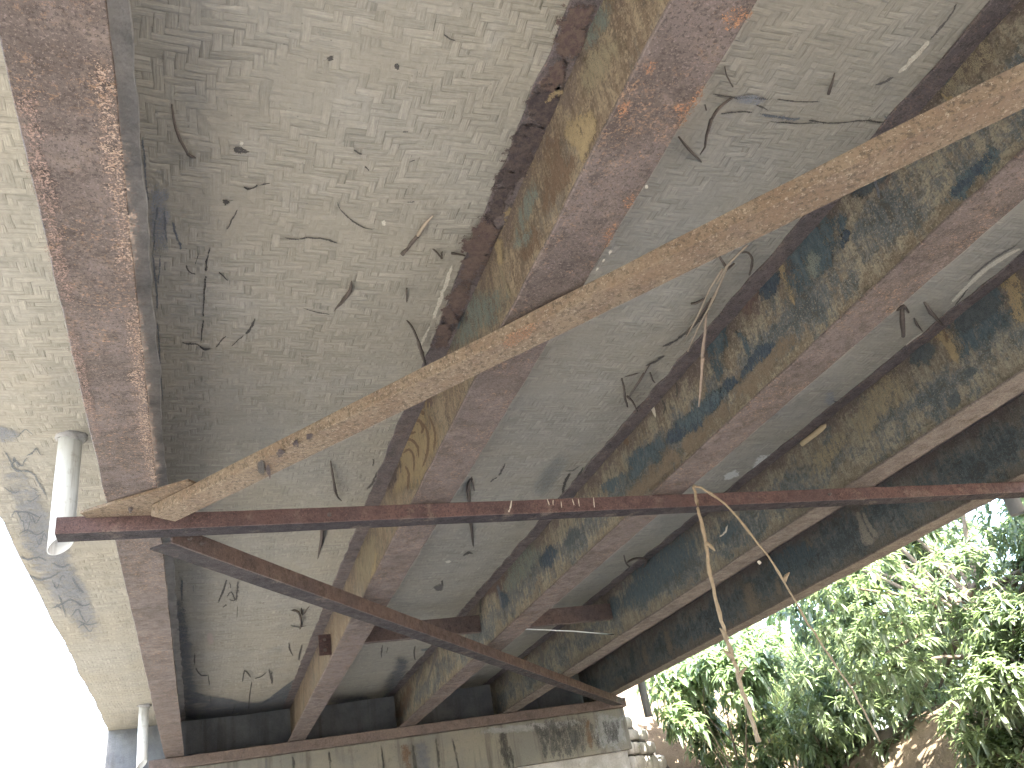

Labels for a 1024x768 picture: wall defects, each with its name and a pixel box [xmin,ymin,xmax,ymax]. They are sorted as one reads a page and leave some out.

peeling [564,108,599,162]
damp [851,175,888,201]
damp [942,142,1005,206]
damp [759,210,851,303]
peeling [418,266,453,351]
damp [601,324,775,493]
crack [1,429,95,632]